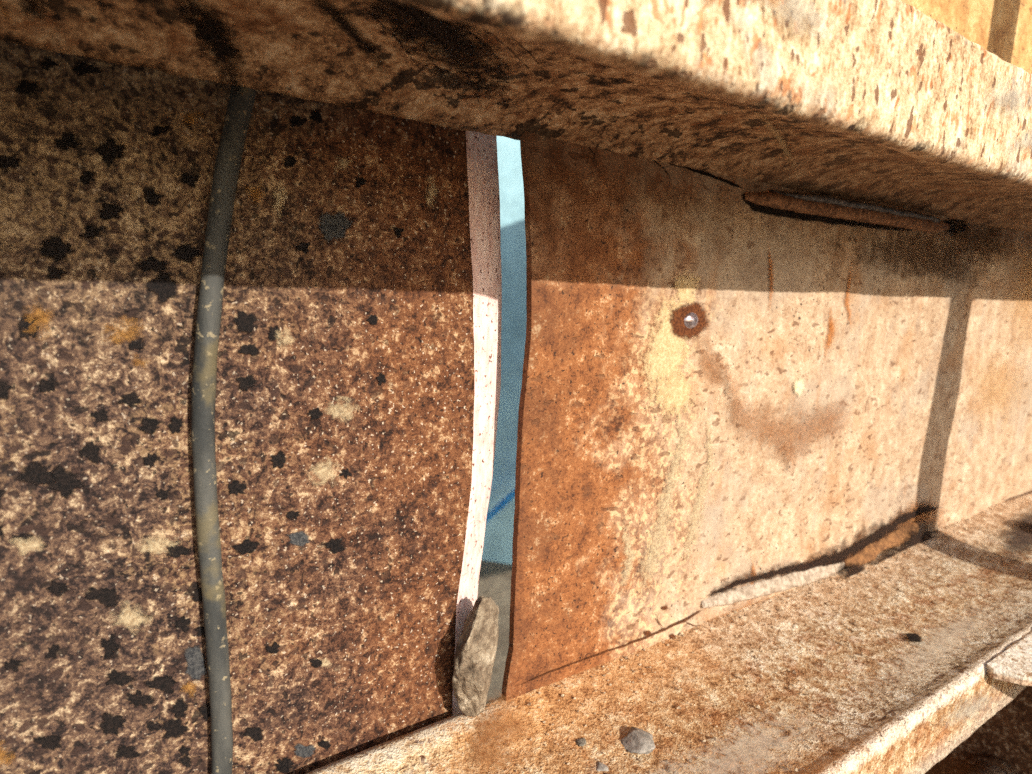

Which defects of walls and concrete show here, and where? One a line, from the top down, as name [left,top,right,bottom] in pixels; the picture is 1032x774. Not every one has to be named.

damp [356,0,543,97]
rust [670,302,710,339]
crack [521,611,700,685]